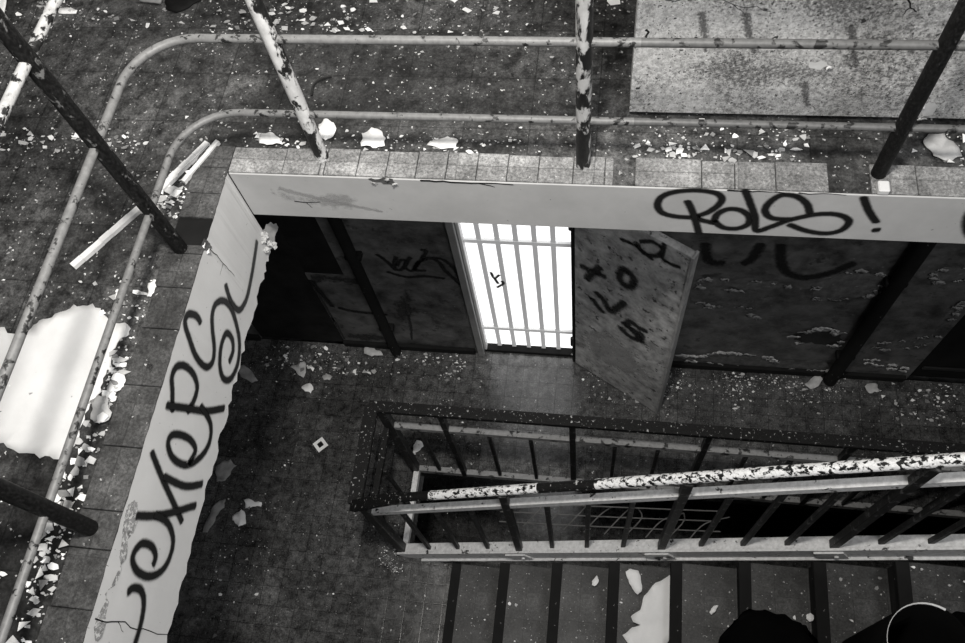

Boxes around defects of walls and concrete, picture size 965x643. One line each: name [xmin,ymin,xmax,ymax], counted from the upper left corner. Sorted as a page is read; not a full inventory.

peeling [259,132,283,145]
peeling [318,118,336,140]
peeling [786,327,847,348]
peeling [90,377,126,423]